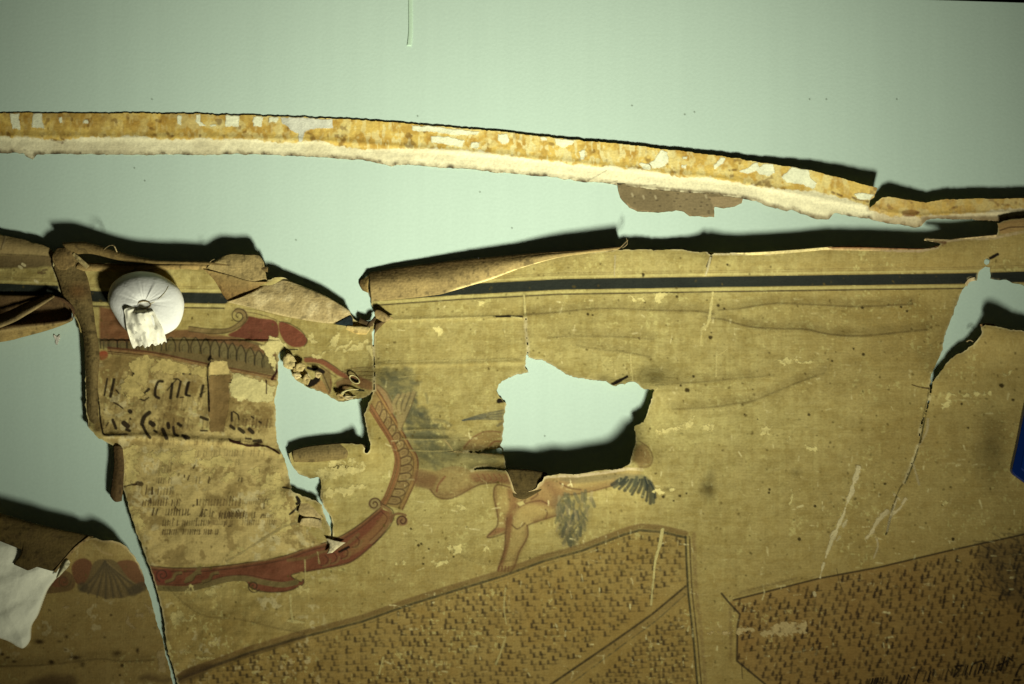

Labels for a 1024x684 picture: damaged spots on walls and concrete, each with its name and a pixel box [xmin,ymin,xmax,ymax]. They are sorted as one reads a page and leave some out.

peeling [10,113,44,130]
peeling [196,114,239,127]
peeling [253,116,333,142]
peeling [412,126,479,148]
peeling [540,137,585,160]
peeling [640,150,668,170]
peeling [740,163,817,189]
peeling [123,444,235,491]
peeling [316,458,367,498]
peeling [248,466,293,537]
peeling [129,506,145,532]